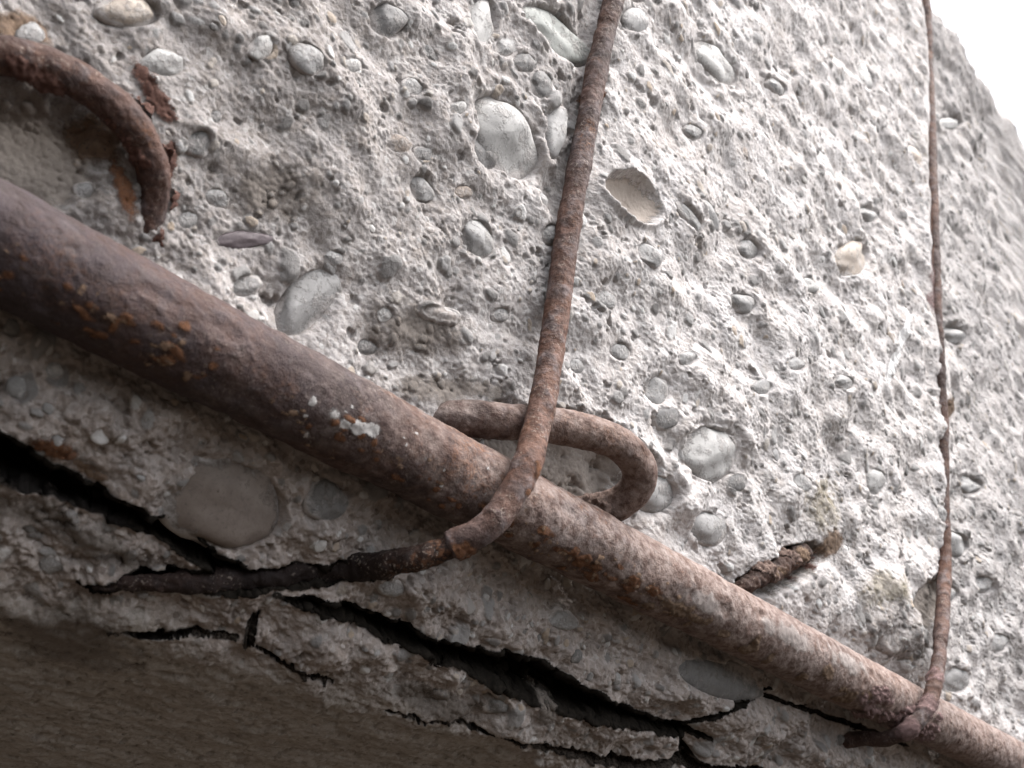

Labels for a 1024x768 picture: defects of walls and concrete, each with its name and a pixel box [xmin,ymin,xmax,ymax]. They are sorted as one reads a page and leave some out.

corrosion [130,56,179,178]
corrosion [58,116,139,222]
corrosion [927,213,936,315]
corrosion [941,397,955,417]
corrosion [29,438,108,481]
spalling [474,438,518,460]
spalling [540,443,622,496]
spalling [754,547,817,595]
corrosion [784,529,843,582]
crack [0,429,907,768]
spalling [913,578,936,631]